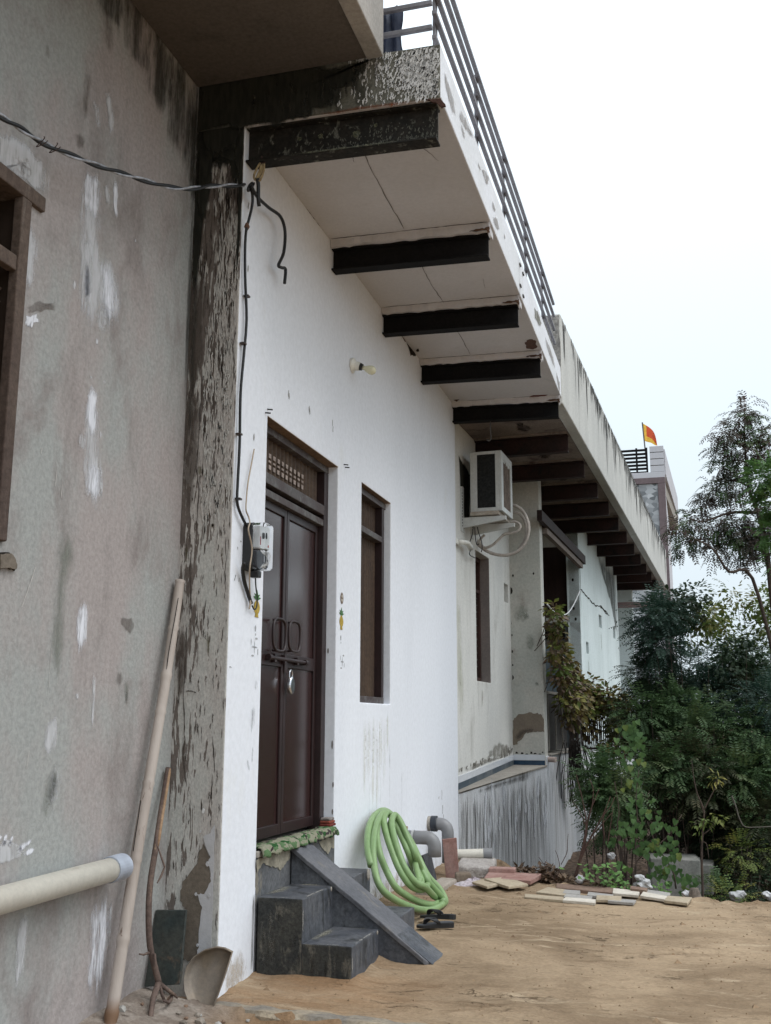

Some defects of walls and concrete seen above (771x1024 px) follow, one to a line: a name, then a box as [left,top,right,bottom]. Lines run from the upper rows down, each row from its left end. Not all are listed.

water stain [104,0,141,60]
peeling [337,46,472,138]
crack [309,156,483,239]
water stain [155,34,369,500]
water stain [178,635,186,693]
peeling [185,674,224,824]
spalling [513,712,544,755]
water stain [461,770,578,865]
spalling [173,821,217,961]